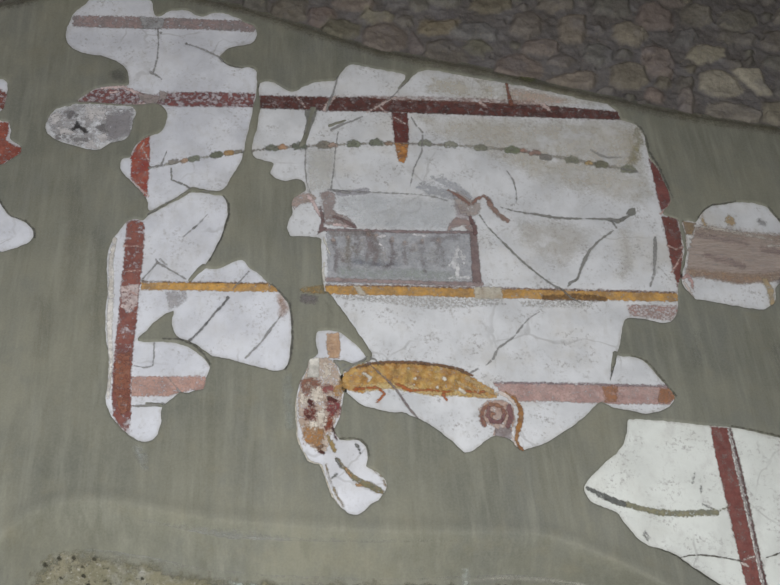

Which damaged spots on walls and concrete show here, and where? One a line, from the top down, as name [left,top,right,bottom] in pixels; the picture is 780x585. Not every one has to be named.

flaking render [304,109,317,134]
crack [326,76,435,198]
crack [140,258,186,281]
crack [479,171,630,303]
crack [649,237,657,287]
crack [137,271,249,368]
crack [245,285,293,368]
crack [471,314,536,373]
crack [132,380,181,407]
crack [352,356,418,418]
crack [610,355,677,397]
spalling [36,552,223,585]